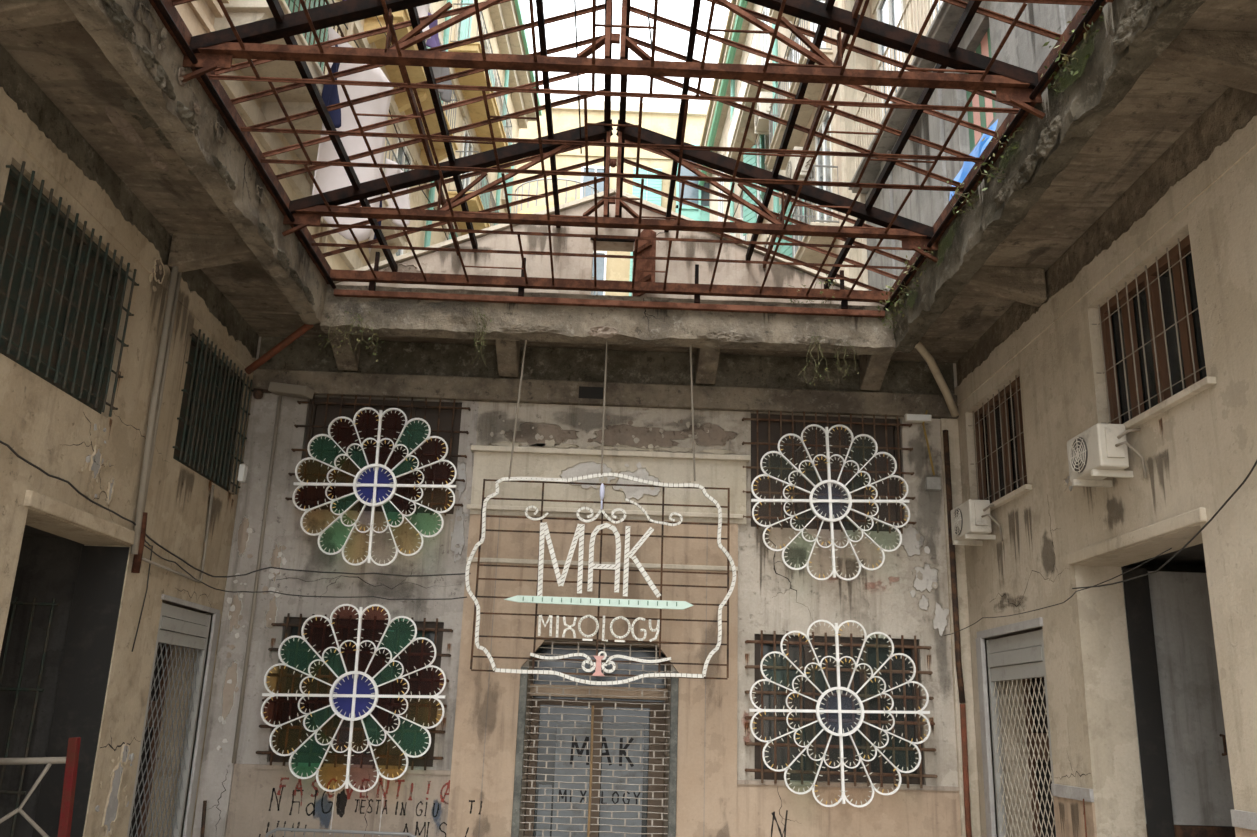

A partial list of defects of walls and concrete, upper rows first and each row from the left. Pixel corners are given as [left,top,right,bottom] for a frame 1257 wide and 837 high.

damp [1103,2,1113,34]
damp [911,113,929,181]
flaking render [489,414,739,501]